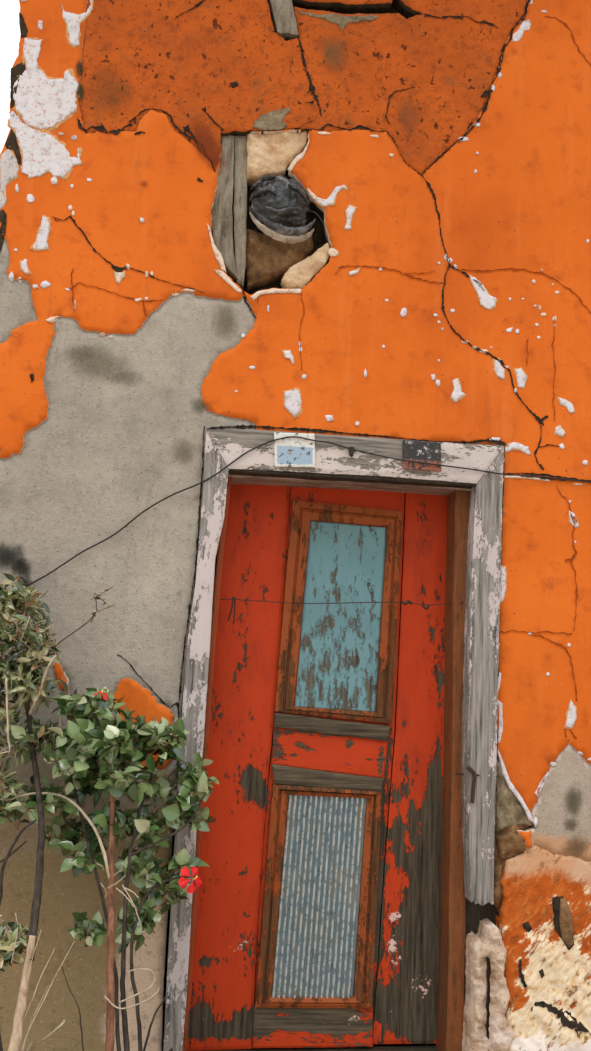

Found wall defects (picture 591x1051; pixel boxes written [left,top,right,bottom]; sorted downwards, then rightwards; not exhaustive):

crack [53,215,204,317]
peeling [0,0,531,793]
crack [77,0,591,719]
peeling [437,254,557,339]
water stain [0,545,32,592]
peeling [0,759,178,1051]
peeling [493,672,591,917]